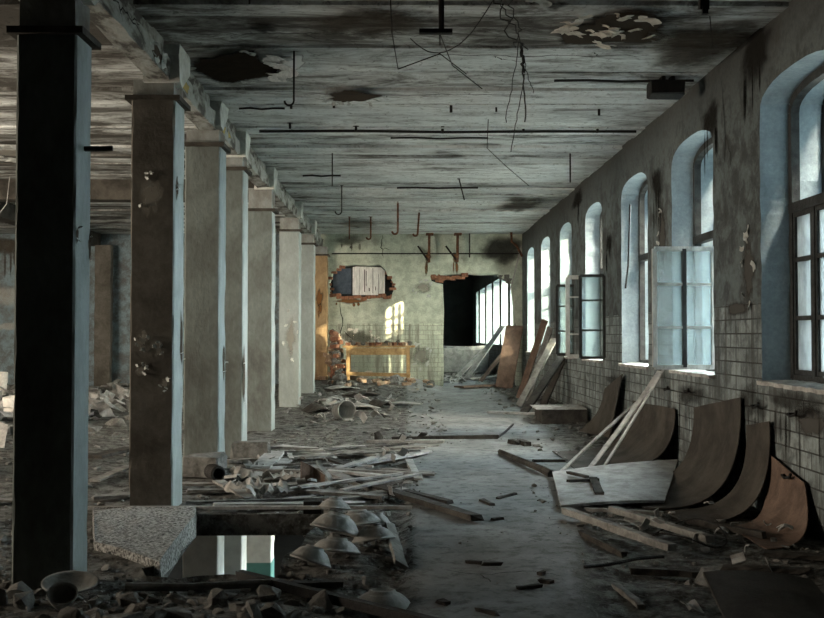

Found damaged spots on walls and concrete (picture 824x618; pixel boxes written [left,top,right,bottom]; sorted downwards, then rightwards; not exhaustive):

peeling [551,13,662,50]
peeling [239,50,305,82]
spalling [328,265,396,300]